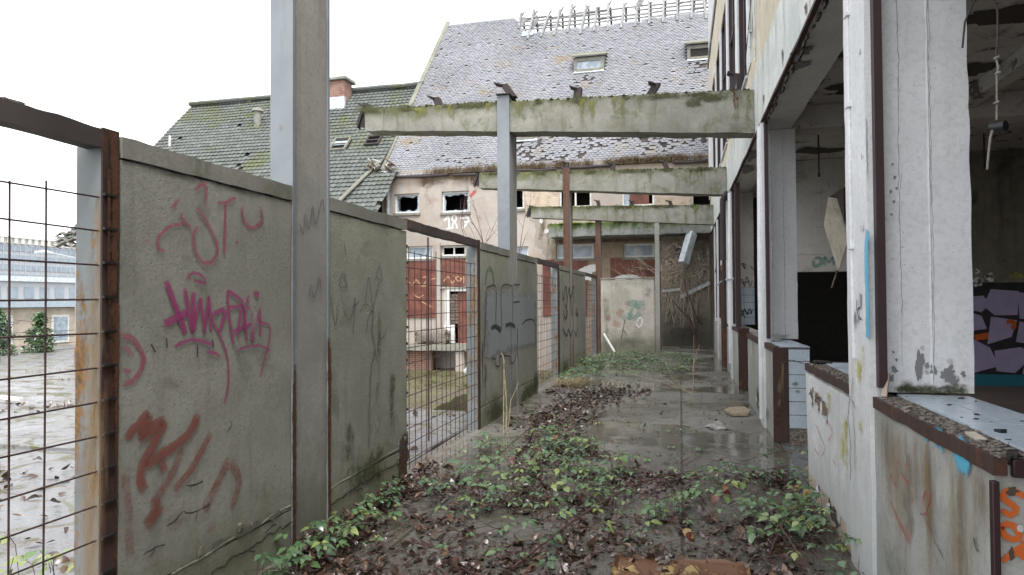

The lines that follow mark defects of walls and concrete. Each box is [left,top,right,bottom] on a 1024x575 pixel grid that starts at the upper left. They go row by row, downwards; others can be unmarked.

corrosion [107,132,120,525]
peeling [915,345,966,386]